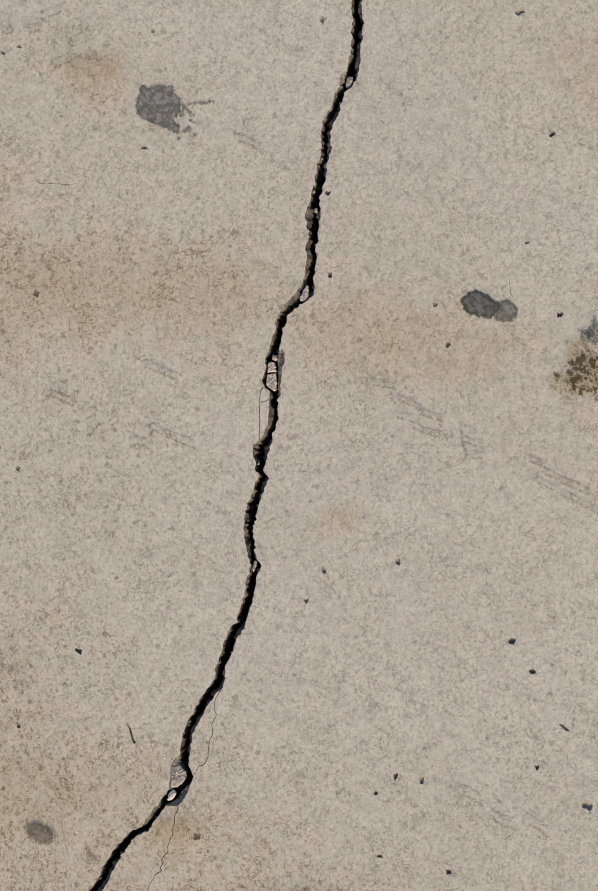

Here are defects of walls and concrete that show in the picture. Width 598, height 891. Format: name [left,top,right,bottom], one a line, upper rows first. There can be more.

crack [89,0,364,891]